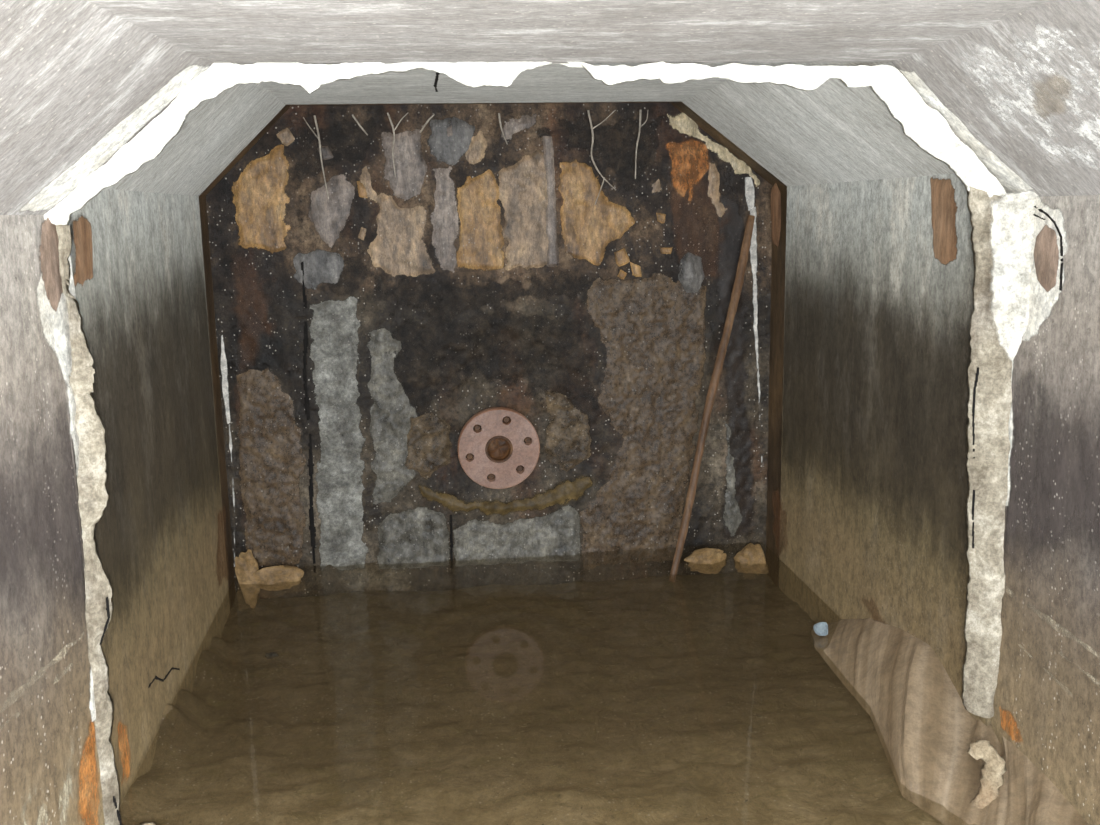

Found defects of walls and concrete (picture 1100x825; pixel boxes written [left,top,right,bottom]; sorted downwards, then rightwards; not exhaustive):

spalling [20,62,552,825]
spalling [232,116,707,570]
peeling [563,62,1067,718]
water stain [1005,396,1100,551]
corrosion [78,719,98,825]
corrosion [118,724,130,782]
crack [148,667,180,688]